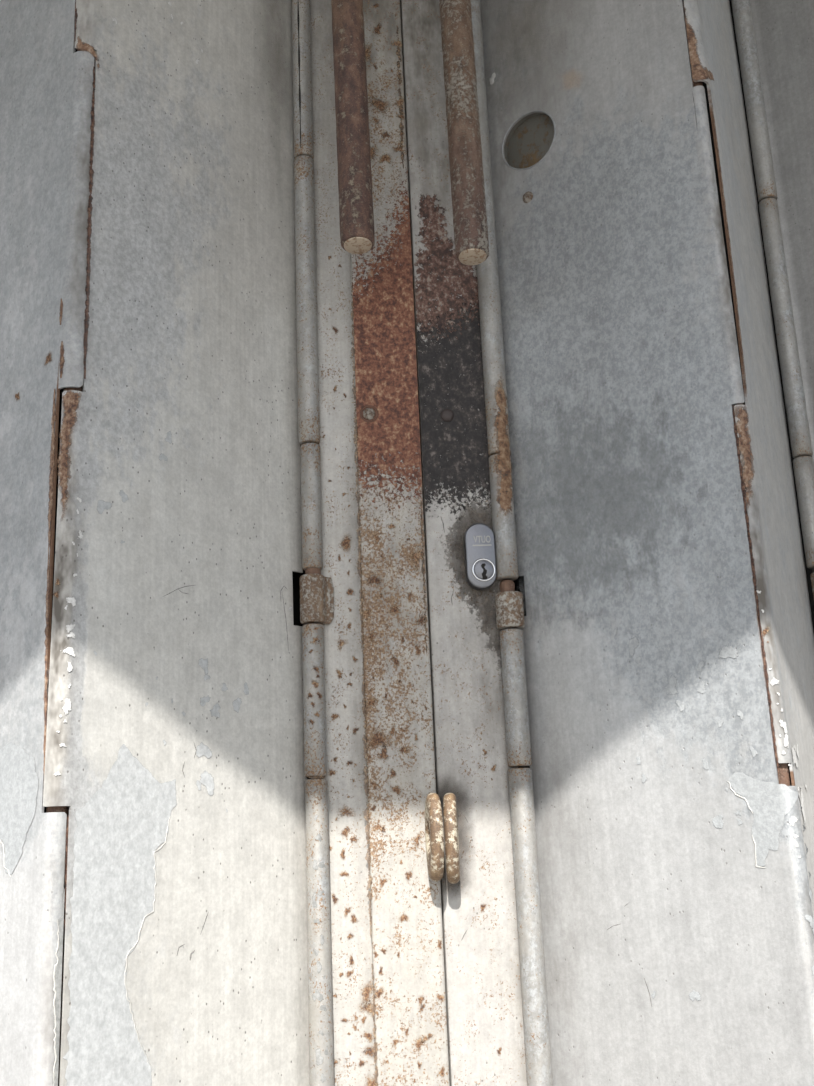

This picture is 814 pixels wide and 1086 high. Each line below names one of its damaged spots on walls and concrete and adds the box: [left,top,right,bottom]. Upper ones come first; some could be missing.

corrosion [75,0,100,379]
corrosion [684,8,747,389]
corrosion [43,341,81,771]
corrosion [305,14,480,940]
leakage [416,291,491,521]
corrosion [494,380,513,516]
corrosion [733,406,779,775]
peeling [727,772,808,868]
peeling [769,668,799,772]
corrosion [341,949,400,1086]
corrosion [393,1029,433,1082]